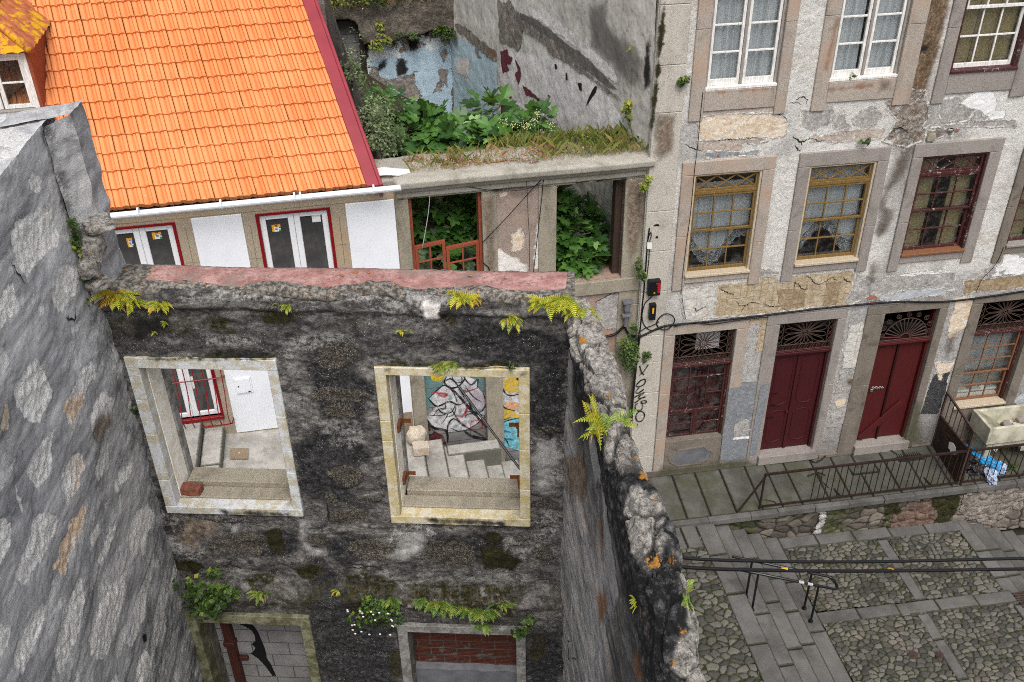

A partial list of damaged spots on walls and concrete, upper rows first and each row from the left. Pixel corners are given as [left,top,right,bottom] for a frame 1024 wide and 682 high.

peeling [366,0,625,133]
crack [685,96,826,151]
spalling [695,88,1018,159]
crack [695,277,848,312]
peeling [680,252,1024,353]